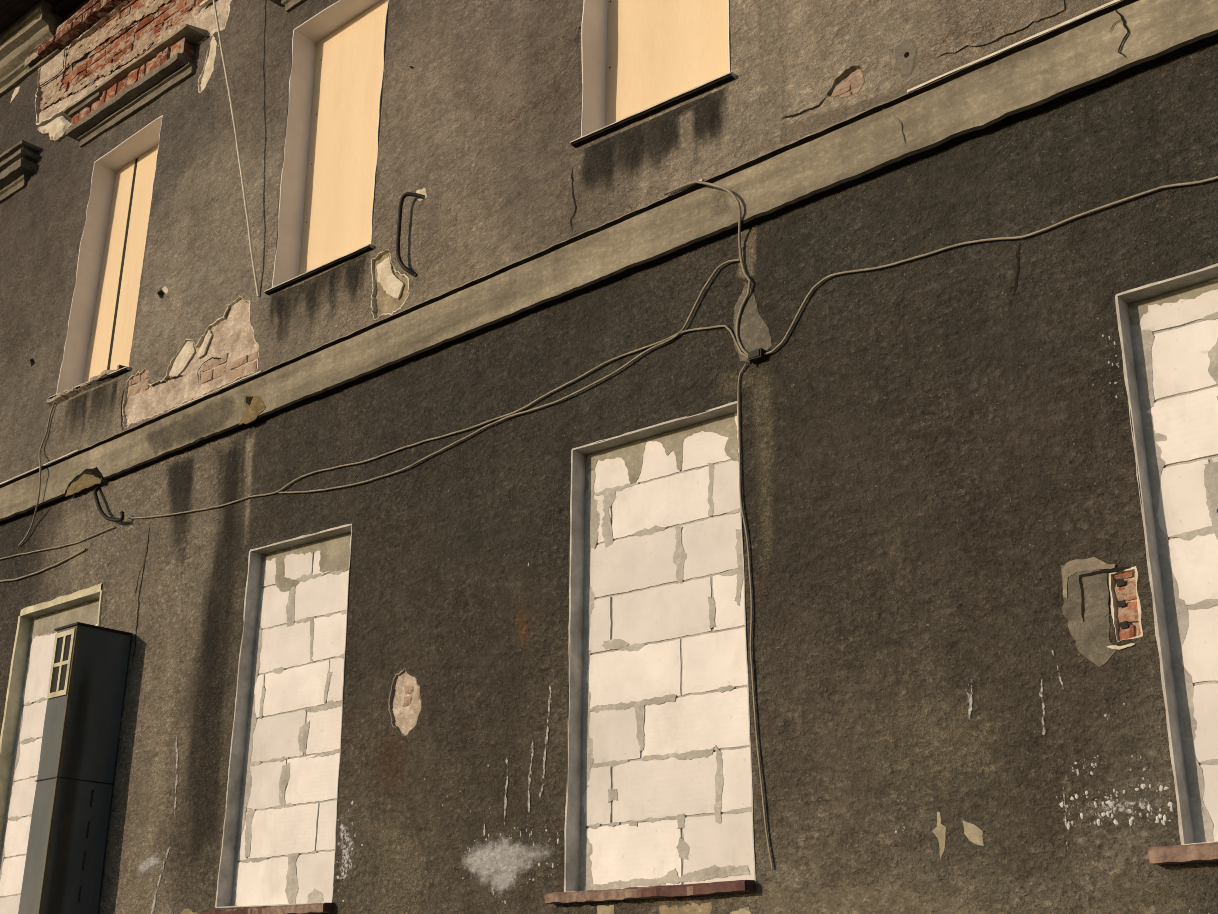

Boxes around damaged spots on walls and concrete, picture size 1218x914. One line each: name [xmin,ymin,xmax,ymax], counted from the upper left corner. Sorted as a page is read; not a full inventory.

crack [1109,9,1129,58]
spalling [35,0,232,142]
spalling [826,64,865,97]
leakage [583,88,723,184]
crack [569,167,577,228]
leakage [270,254,366,326]
spalling [371,249,410,320]
spalling [122,296,259,428]
leakage [147,397,233,453]
leakage [169,459,193,535]
leakage [190,438,253,853]
spalling [388,667,422,736]